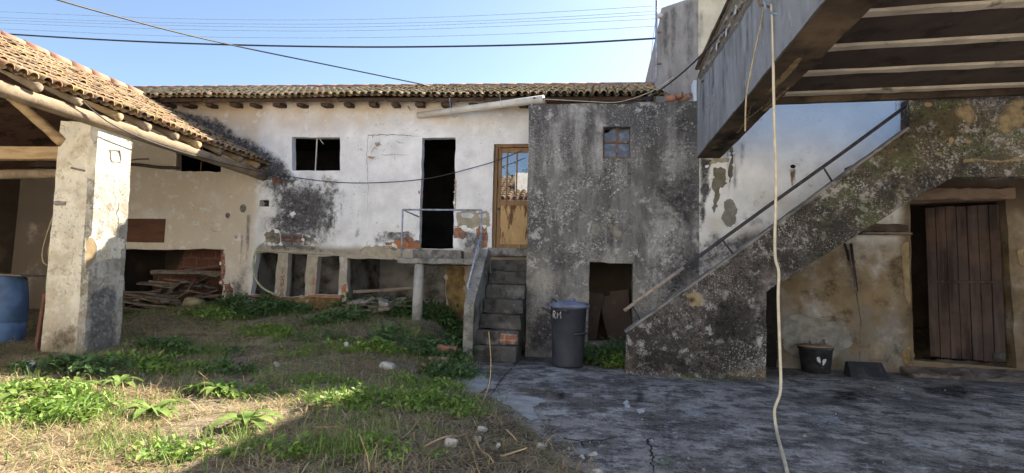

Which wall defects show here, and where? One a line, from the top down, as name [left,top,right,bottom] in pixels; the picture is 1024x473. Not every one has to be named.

damp [180,112,323,242]
peeling [355,234,423,260]
peeling [453,179,492,249]
peeling [692,145,739,251]
crack [563,436,655,473]